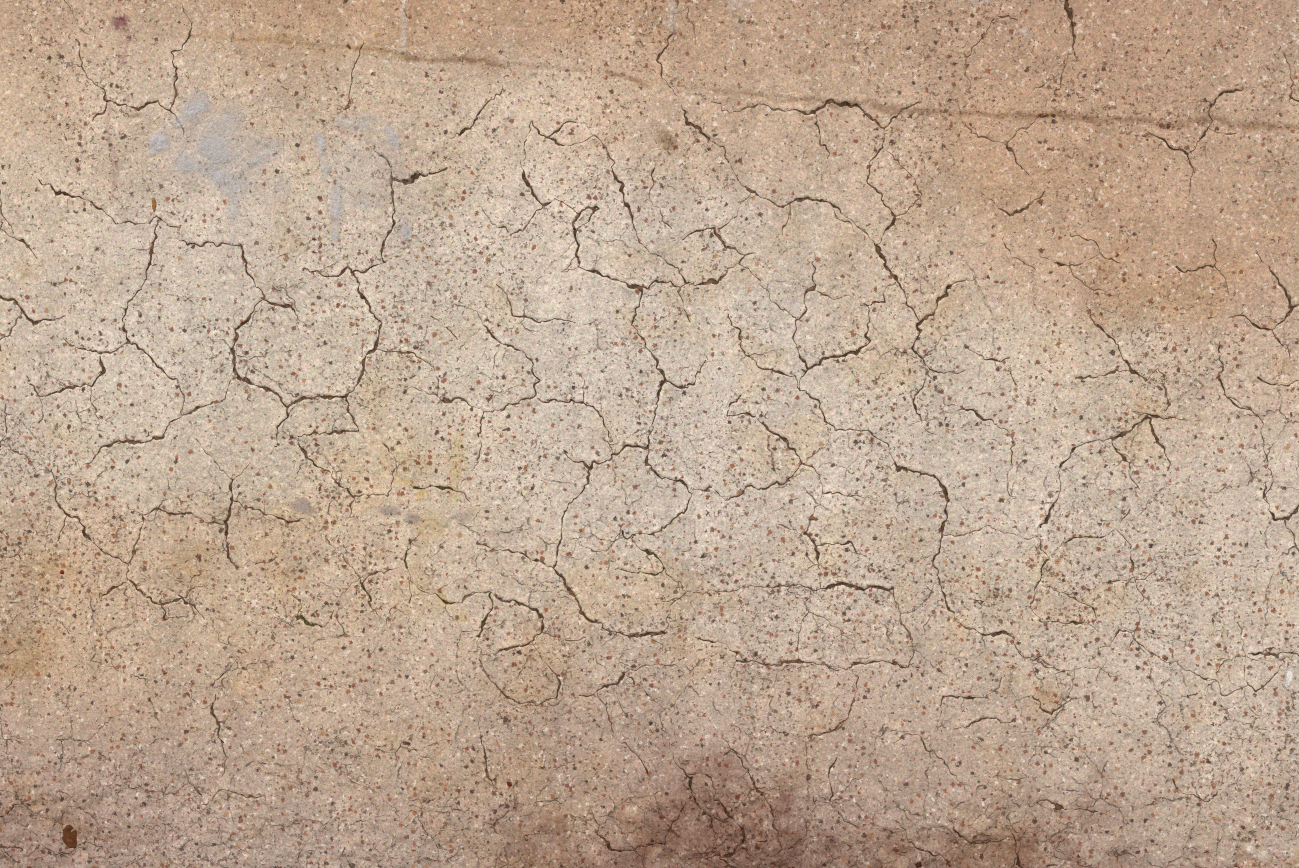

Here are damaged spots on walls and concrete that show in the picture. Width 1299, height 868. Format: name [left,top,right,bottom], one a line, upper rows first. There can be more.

crack [1145,84,1251,195]
crack [0,295,65,350]
crack [1176,239,1299,551]
crack [0,403,302,805]
crack [1065,508,1299,696]
crack [478,722,498,792]
crack [579,663,822,868]
crack [813,758,868,829]
crack [896,677,1016,793]
crack [895,810,1058,868]
crack [1028,799,1098,813]
leakage [1245,843,1267,858]